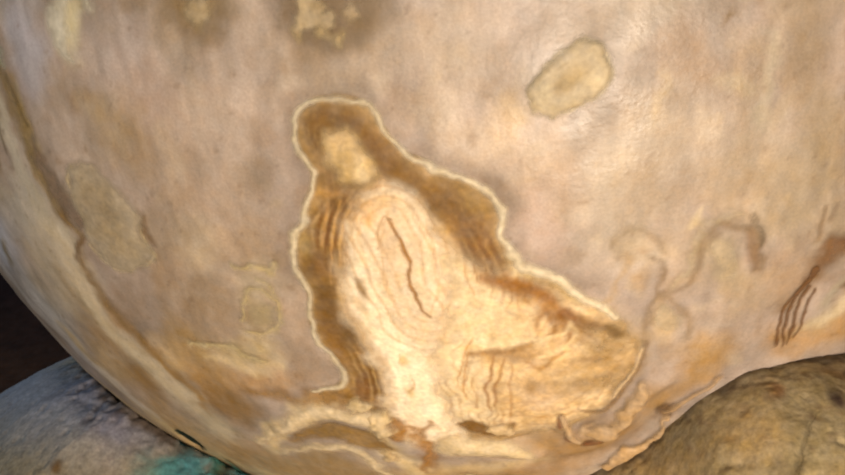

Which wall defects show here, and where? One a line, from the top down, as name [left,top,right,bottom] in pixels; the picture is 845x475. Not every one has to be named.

peeling [293,0,344,46]
corrosion [0,72,130,331]
crack [389,222,429,316]
spalling [558,345,649,446]
spalling [602,377,721,471]